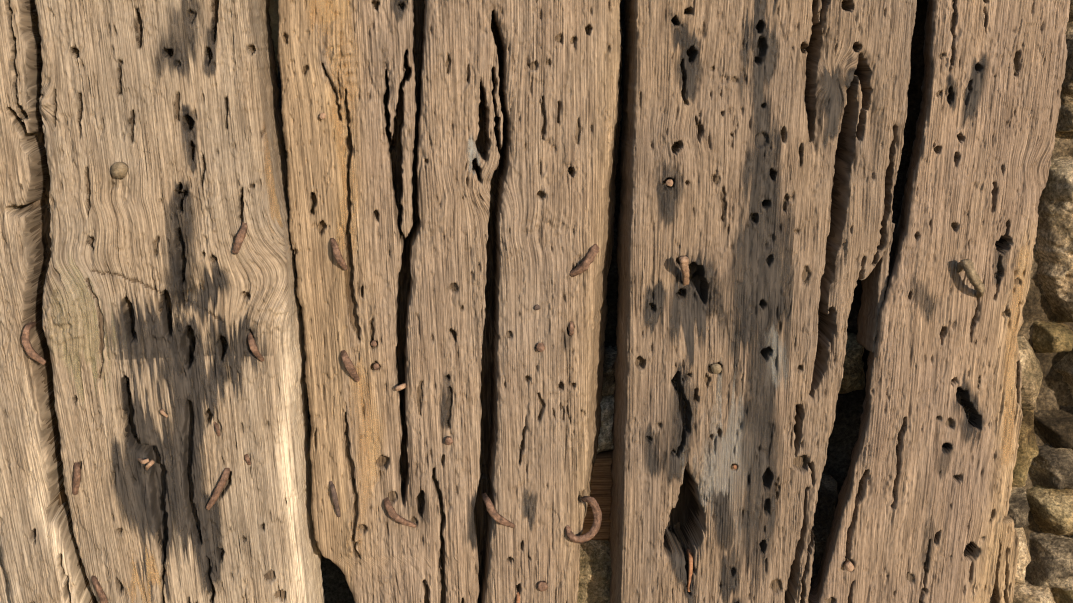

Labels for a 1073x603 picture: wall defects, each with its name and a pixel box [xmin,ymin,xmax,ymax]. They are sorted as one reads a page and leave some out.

crack [804,0,822,117]
crack [814,68,865,368]
crack [15,0,97,603]
crack [86,270,223,378]
crack [384,0,507,603]
crack [158,530,166,603]
crack [519,393,545,462]
crack [846,470,868,555]
crack [891,417,906,505]